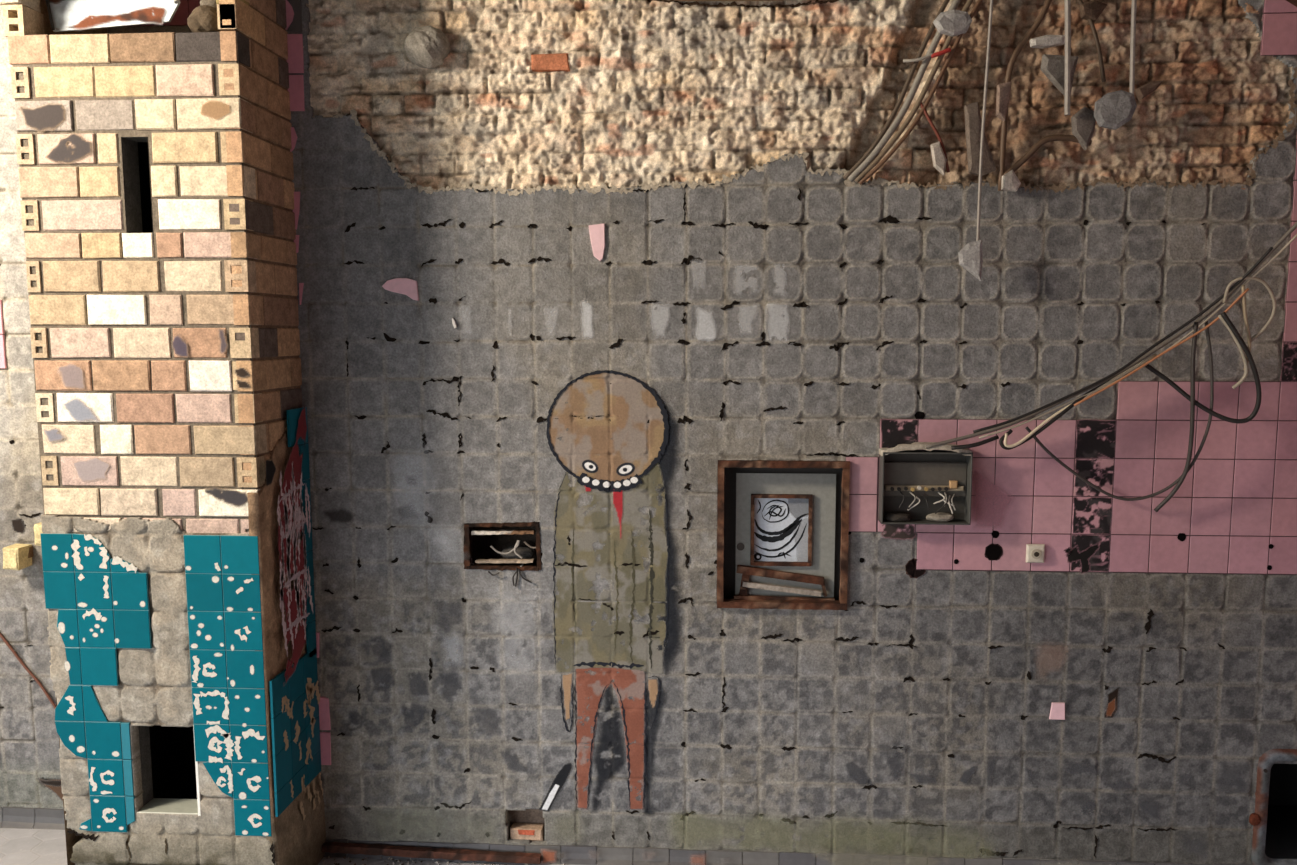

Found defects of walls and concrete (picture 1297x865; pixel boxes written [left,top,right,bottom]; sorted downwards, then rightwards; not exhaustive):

flaking render [306,0,1297,196]
peeling [52,534,138,643]
peeling [190,563,269,836]
spalling [39,779,63,801]
peeling [69,735,124,830]